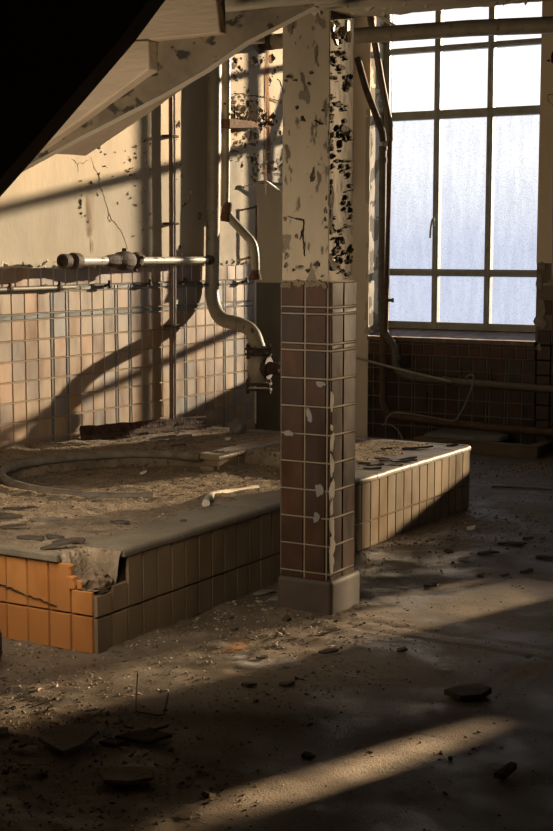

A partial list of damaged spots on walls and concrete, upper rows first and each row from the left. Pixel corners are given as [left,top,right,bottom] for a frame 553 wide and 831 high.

flaking render [230,50,297,115]
peeling [329,0,407,92]
crack [74,160,128,250]
flaking render [230,128,283,183]
spalling [280,94,354,289]
crack [0,584,57,606]